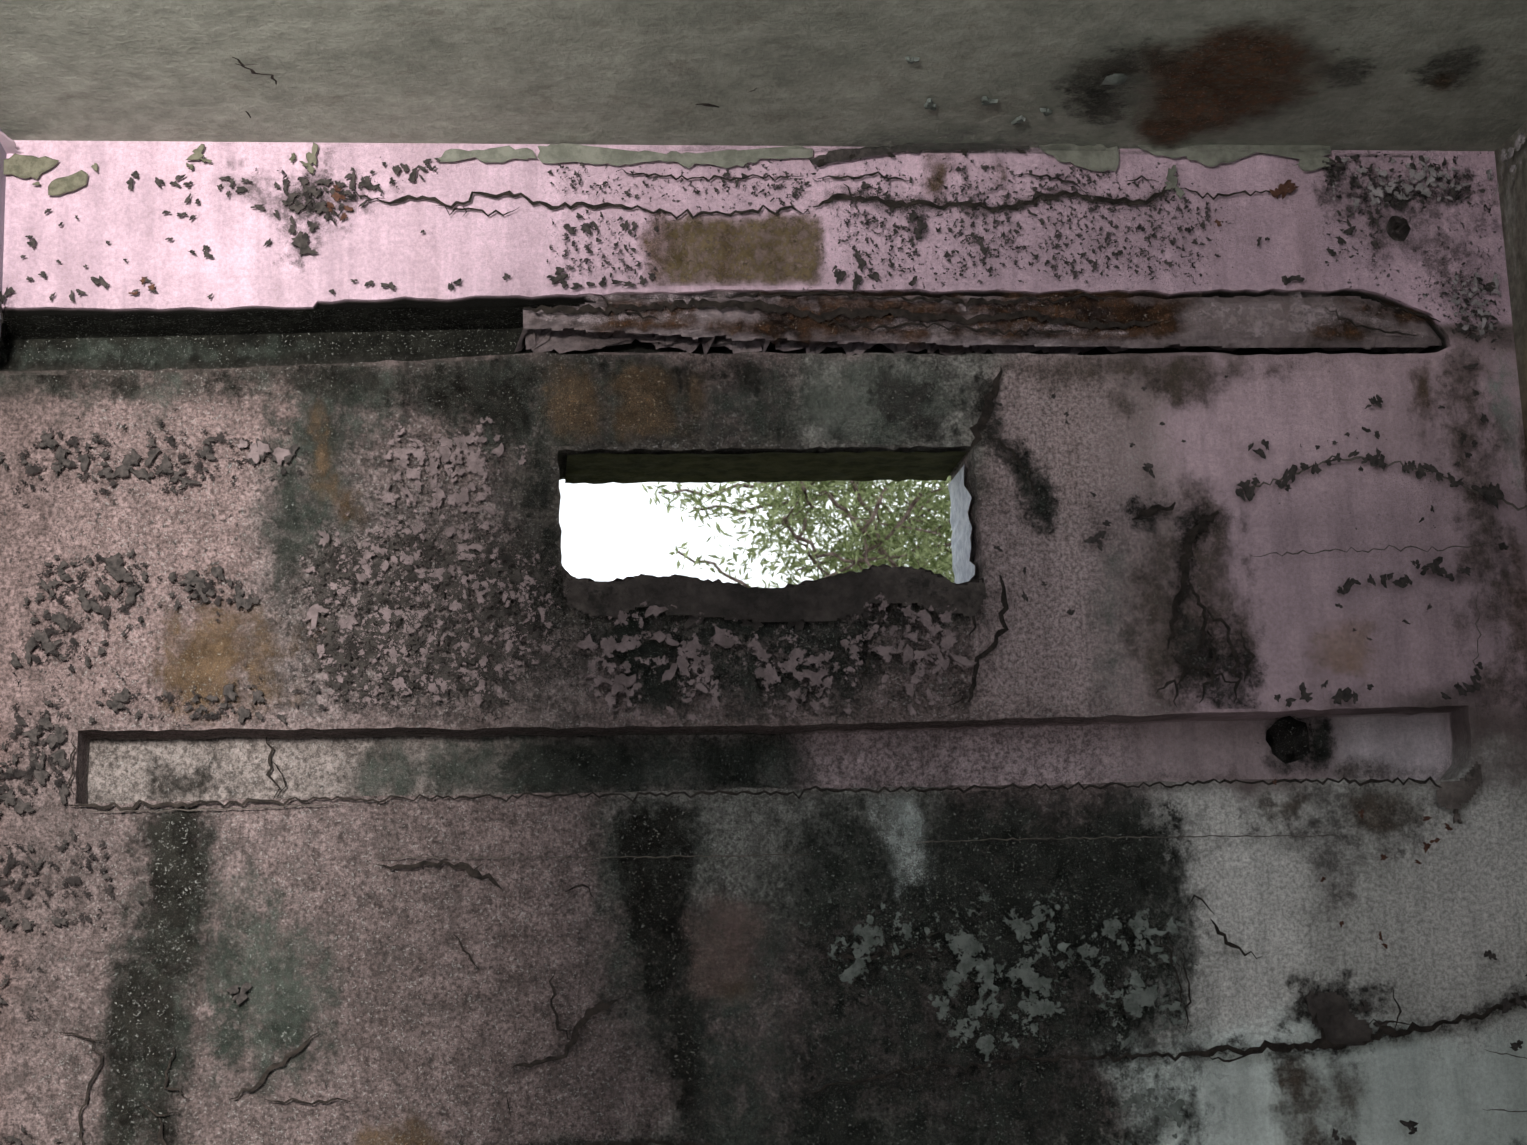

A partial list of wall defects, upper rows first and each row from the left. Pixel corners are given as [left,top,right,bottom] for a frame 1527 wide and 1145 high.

rust [1104,21,1325,148]
damp [642,215,822,285]
crack [350,169,1270,219]
peeling [126,132,1527,324]
rust [573,290,1192,343]
rust [1308,300,1431,341]
peeling [0,408,986,1046]
damp [97,757,307,1145]
crack [376,854,808,899]
damp [745,791,1201,1145]
flaking render [811,880,1198,1067]
crack [810,895,1527,1095]